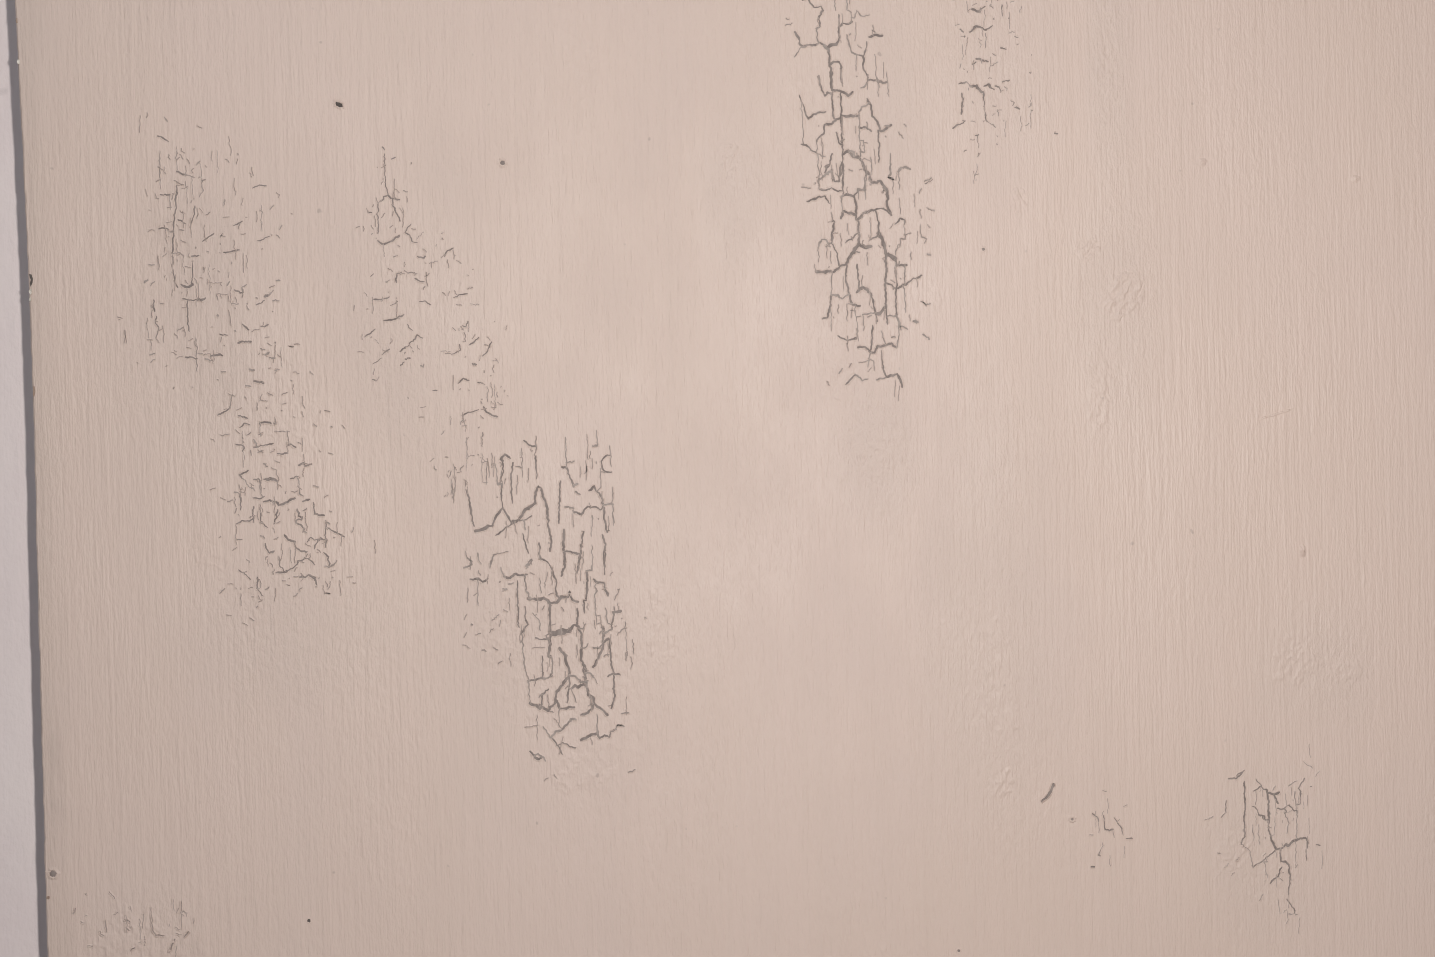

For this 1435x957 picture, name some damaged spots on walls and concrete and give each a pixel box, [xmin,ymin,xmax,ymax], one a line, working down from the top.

crack [117,112,378,626]
crack [352,145,647,782]
crack [785,0,935,401]
crack [952,0,1058,184]
crack [1204,744,1324,934]